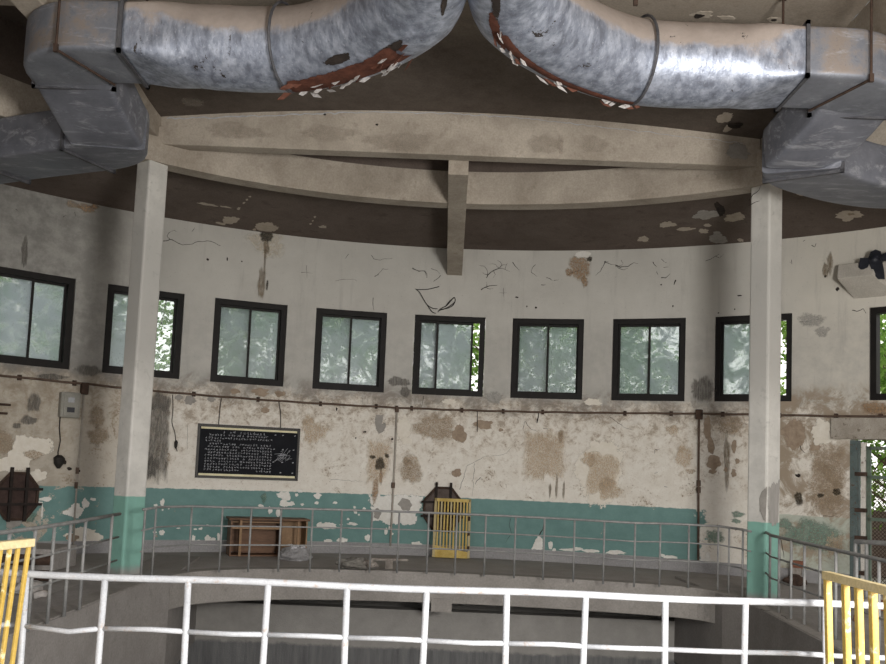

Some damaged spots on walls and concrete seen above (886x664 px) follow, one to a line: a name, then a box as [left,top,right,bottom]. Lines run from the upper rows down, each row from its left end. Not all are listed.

spalling [660,202,745,244]
water stain [255,232,278,297]
water stain [152,392,169,410]
peeling [0,434,55,482]
water stain [147,456,157,478]
water stain [573,438,626,509]
flaking render [6,497,52,529]
peeling [316,494,424,542]